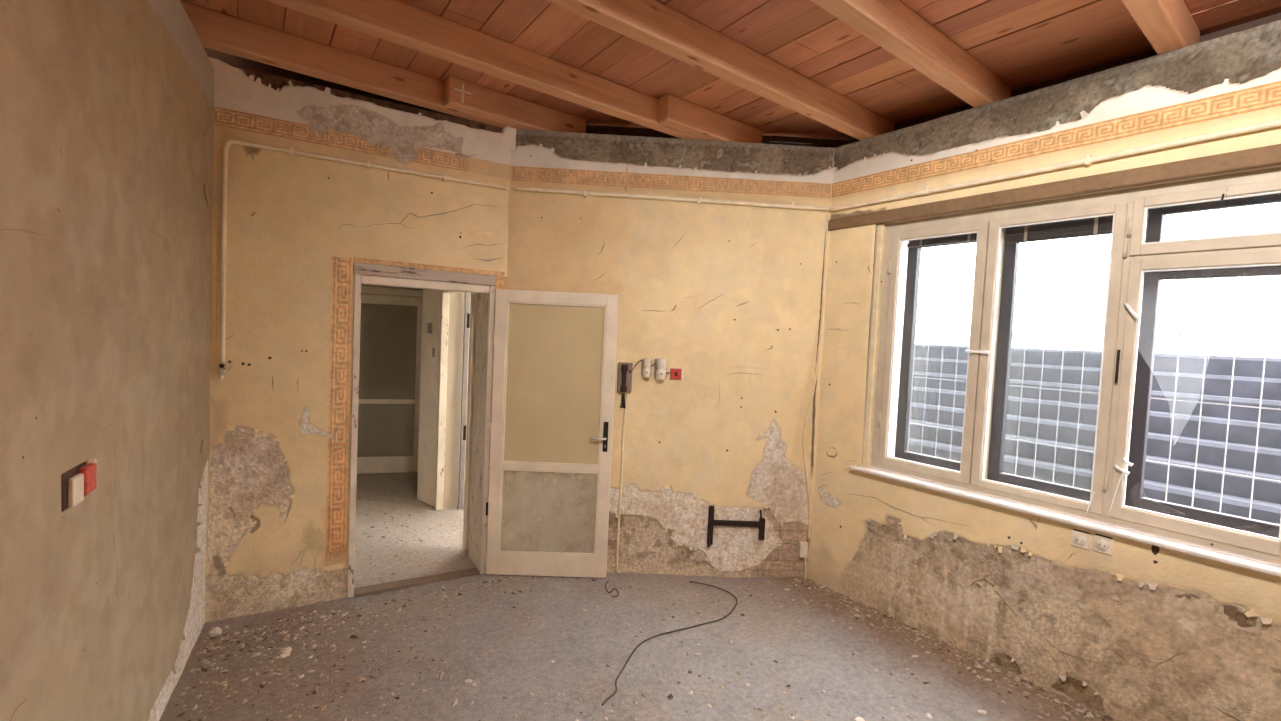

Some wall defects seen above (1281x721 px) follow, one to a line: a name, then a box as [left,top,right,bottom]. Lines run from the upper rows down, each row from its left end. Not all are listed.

flaking render [849,516,1281,721]